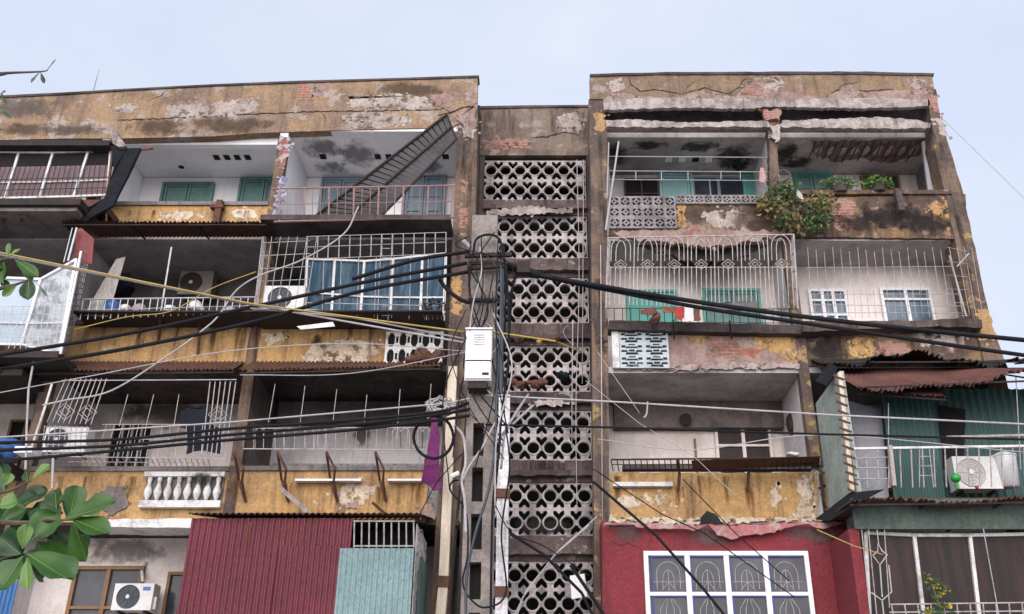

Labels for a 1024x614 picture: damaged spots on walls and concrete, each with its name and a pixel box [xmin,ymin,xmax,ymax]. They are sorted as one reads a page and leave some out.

crack [629,77,747,94]
crack [827,82,893,96]
flaking render [165,96,260,120]
crack [118,90,476,124]
crack [531,126,577,138]
mould [607,142,660,164]
mould [681,142,750,171]
mould [777,144,811,168]
flaking render [701,205,747,230]
peeling [300,337,385,370]
spalling [622,335,800,373]
spalling [609,488,700,525]